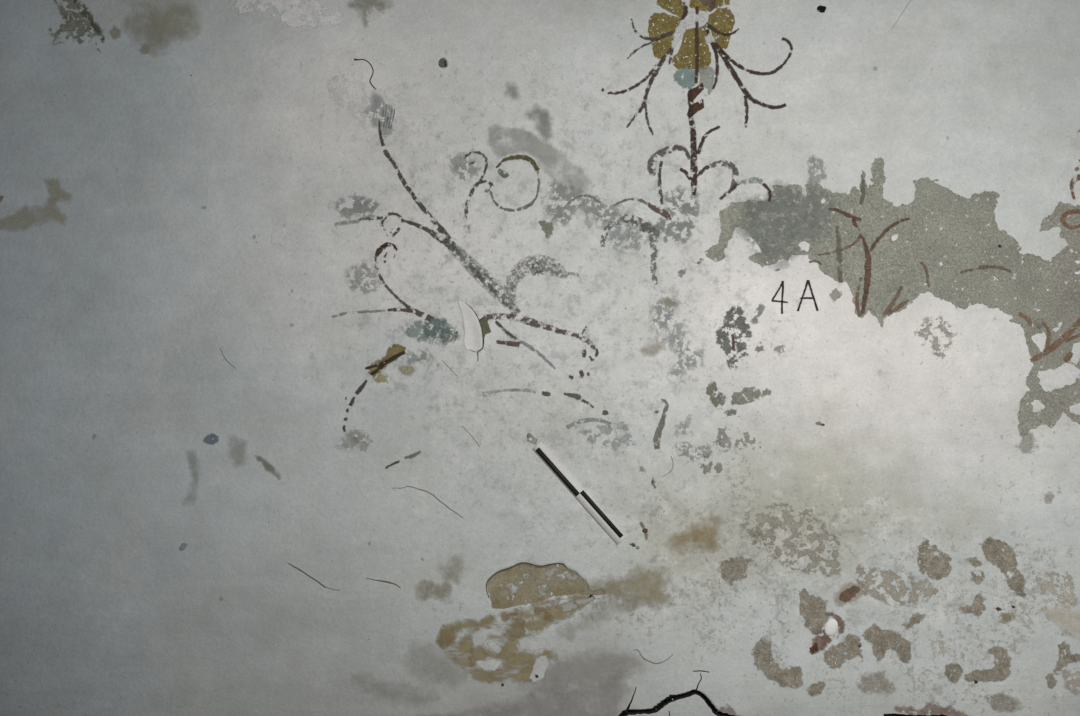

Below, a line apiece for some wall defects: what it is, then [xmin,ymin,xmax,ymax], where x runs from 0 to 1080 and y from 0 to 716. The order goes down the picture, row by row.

damp [49,0,120,51]
peeling [697,158,1080,453]
peeling [702,382,771,474]
peeling [742,504,840,576]
peeling [961,538,1077,616]
peeling [800,589,829,634]
peeling [824,540,951,692]
crack [619,670,735,716]
peeling [753,639,825,696]
crack [884,708,941,716]
peeling [945,646,1011,683]
peeling [1046,642,1080,694]